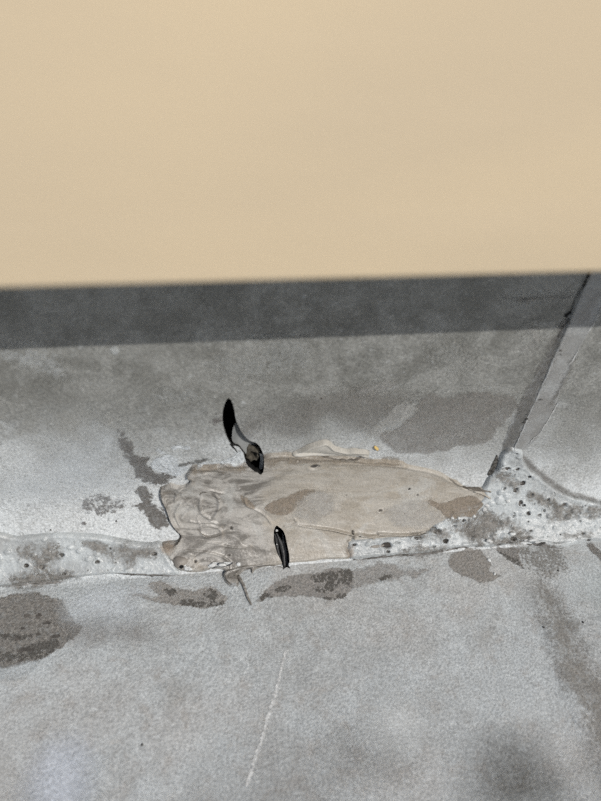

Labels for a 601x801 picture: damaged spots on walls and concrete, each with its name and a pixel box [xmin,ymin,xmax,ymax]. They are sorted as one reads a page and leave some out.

crack [552,272,590,347]
crack [488,455,498,475]